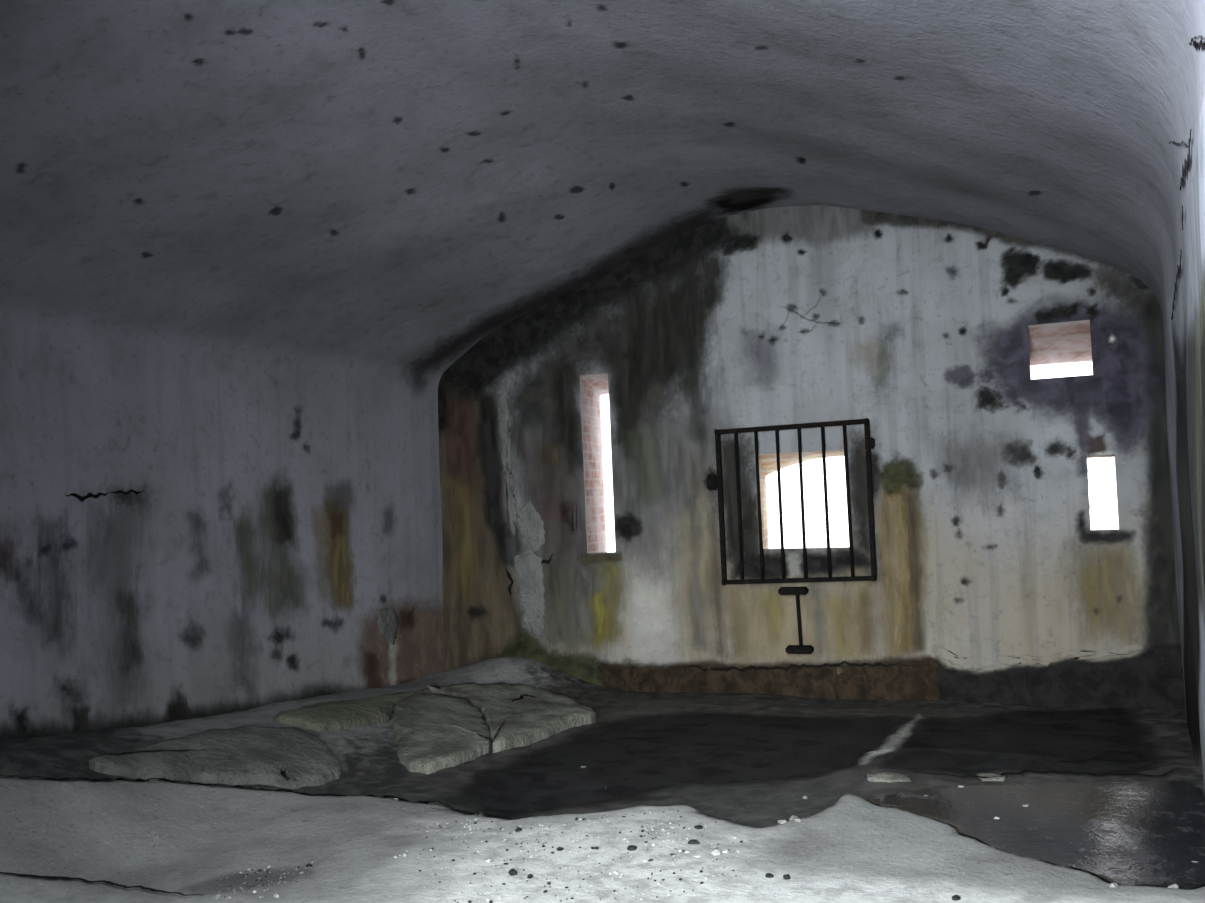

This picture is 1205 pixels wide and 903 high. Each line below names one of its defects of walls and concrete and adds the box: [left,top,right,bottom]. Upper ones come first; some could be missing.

water stain [237,483,301,613]
water stain [438,216,881,670]
water stain [931,248,1205,763]